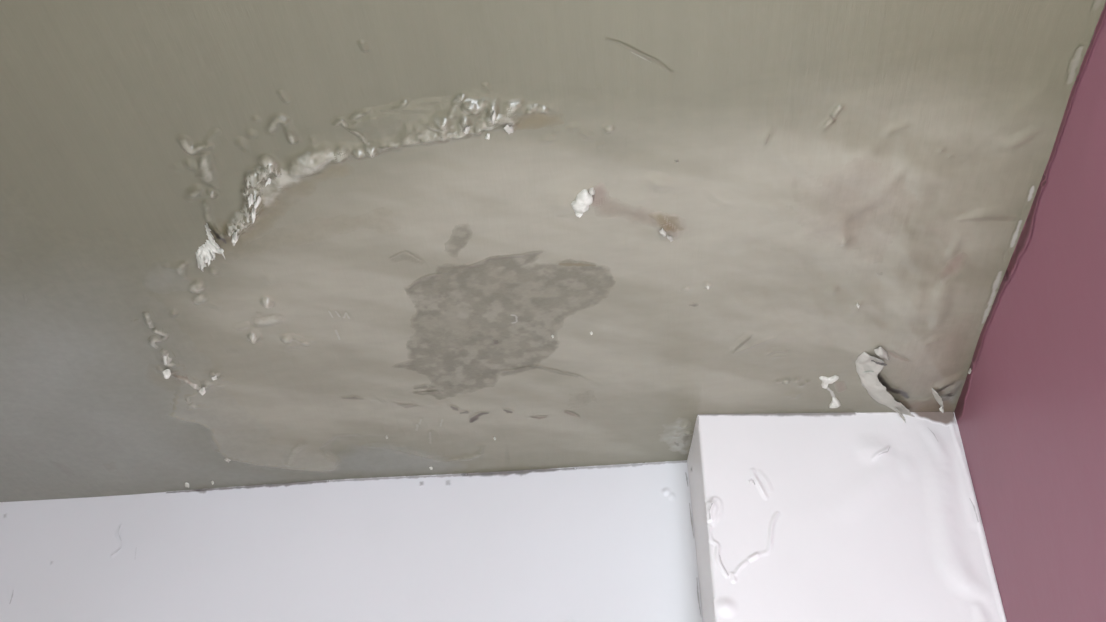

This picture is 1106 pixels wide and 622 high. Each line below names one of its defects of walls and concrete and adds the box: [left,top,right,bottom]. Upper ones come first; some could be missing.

peeling [196,145,378,271]
spalling [571,187,597,218]
damp [389,223,616,400]
peeling [142,312,224,409]
peeling [819,375,848,408]
peeling [855,347,966,423]
peeling [949,425,1007,622]